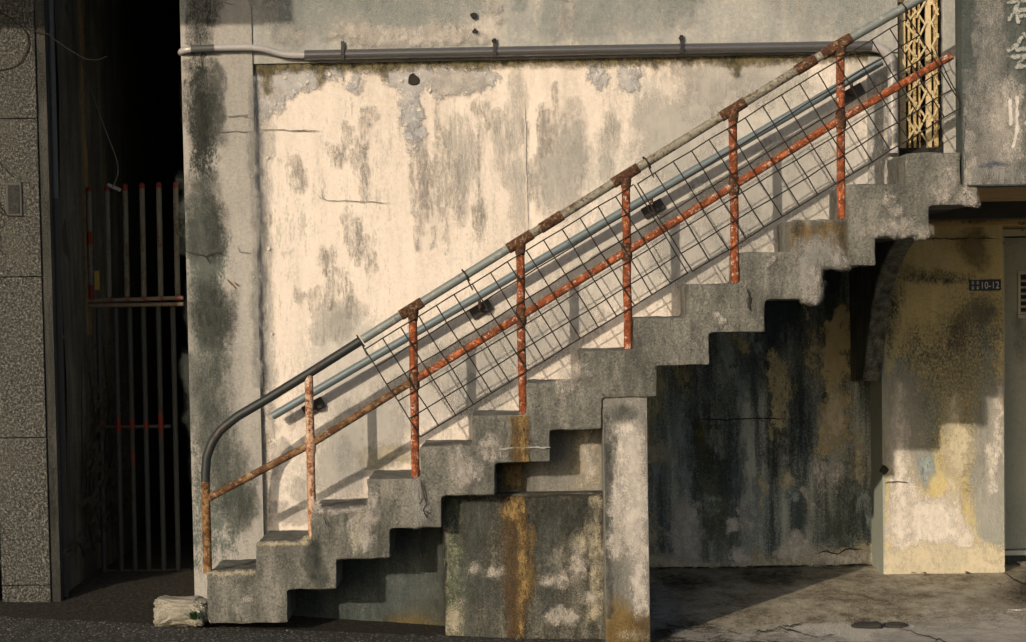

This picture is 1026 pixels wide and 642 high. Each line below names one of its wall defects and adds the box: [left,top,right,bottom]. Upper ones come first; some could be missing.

water stain [182,58,227,260]
peeling [380,65,525,230]
water stain [536,120,586,213]
water stain [186,275,307,527]
water stain [348,494,378,554]
water stain [316,379,420,499]
water stain [355,434,507,638]
crack [419,479,447,629]
corrosion [496,416,534,638]
water stain [649,136,850,517]
water stain [529,345,1005,642]
crack [897,628,946,642]